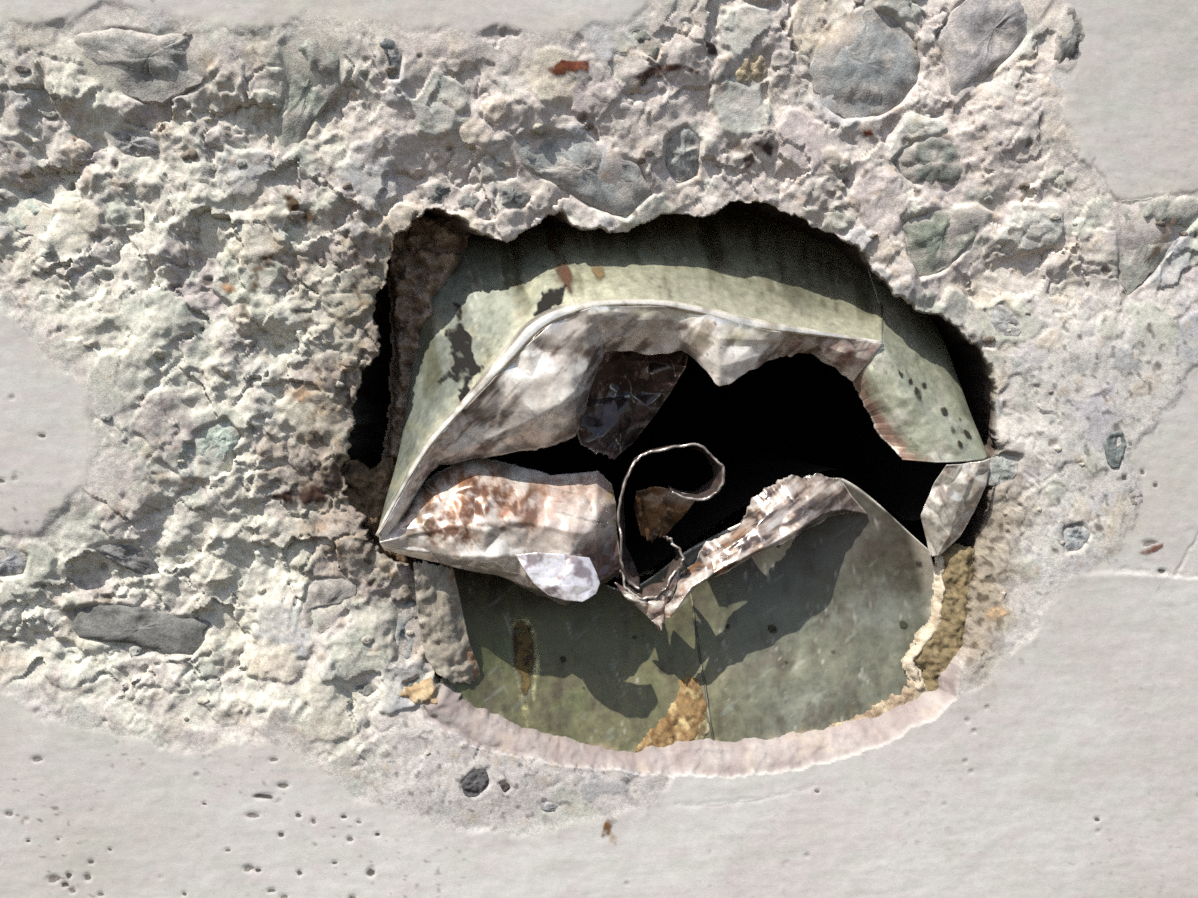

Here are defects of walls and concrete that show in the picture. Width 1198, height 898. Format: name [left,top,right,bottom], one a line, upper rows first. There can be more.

spalling [74,28,205,107]
spalling [809,9,920,119]
spalling [935,0,1028,96]
spalling [519,131,652,216]
spalling [894,137,963,185]
spalling [902,210,979,276]
spalling [986,304,1022,336]
spalling [339,279,393,471]
spalling [923,313,1005,463]
spalling [340,457,423,570]
spalling [71,604,211,655]
corrosion [512,618,539,711]